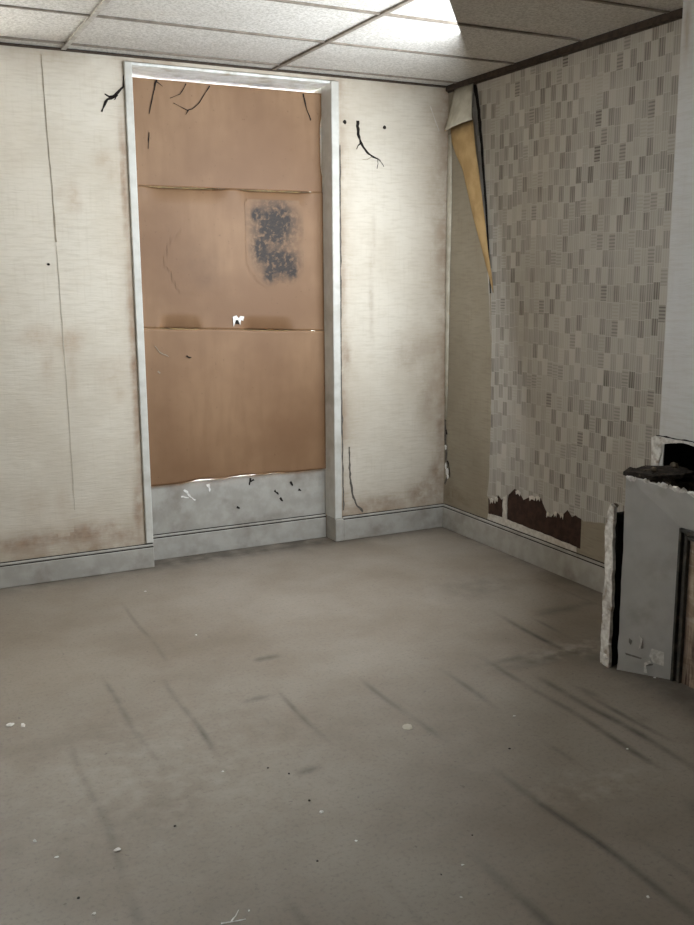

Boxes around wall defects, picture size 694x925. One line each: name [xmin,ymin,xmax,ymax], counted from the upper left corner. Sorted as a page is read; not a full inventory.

crack [101,75,124,112]
crack [149,80,210,114]
damp [245,199,304,287]
crack [339,121,384,512]
flaking render [651,435,694,466]
flaking render [626,475,694,498]
flaking render [600,503,619,668]